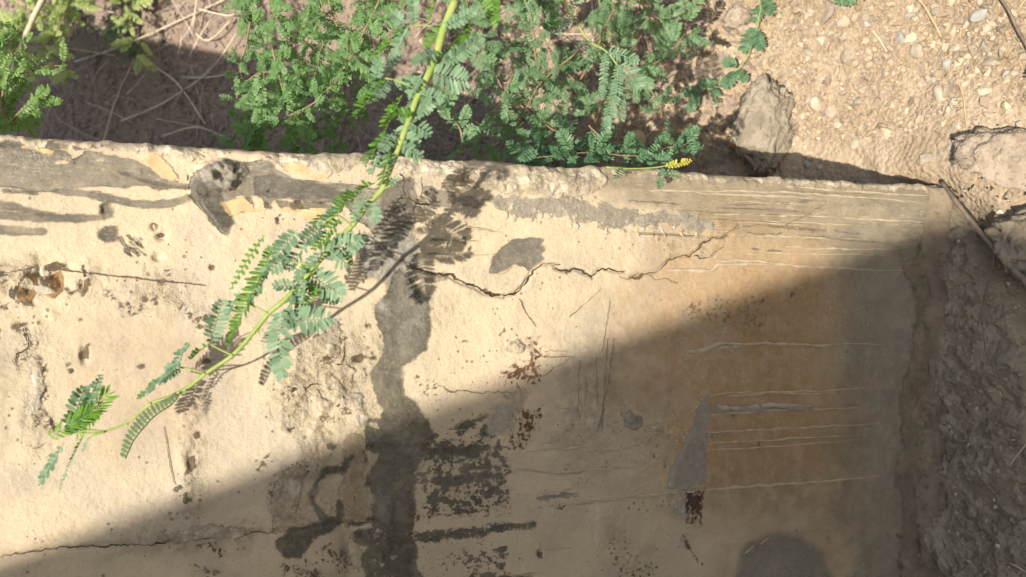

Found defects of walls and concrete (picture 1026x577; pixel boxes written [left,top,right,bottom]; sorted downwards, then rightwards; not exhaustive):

crack [2,264,204,286]
crack [372,204,825,327]
leakage [0,139,930,577]
crack [430,351,573,394]
corrosion [501,337,541,396]
corrosion [505,405,543,450]
crack [0,500,311,558]
corrosion [675,490,704,560]